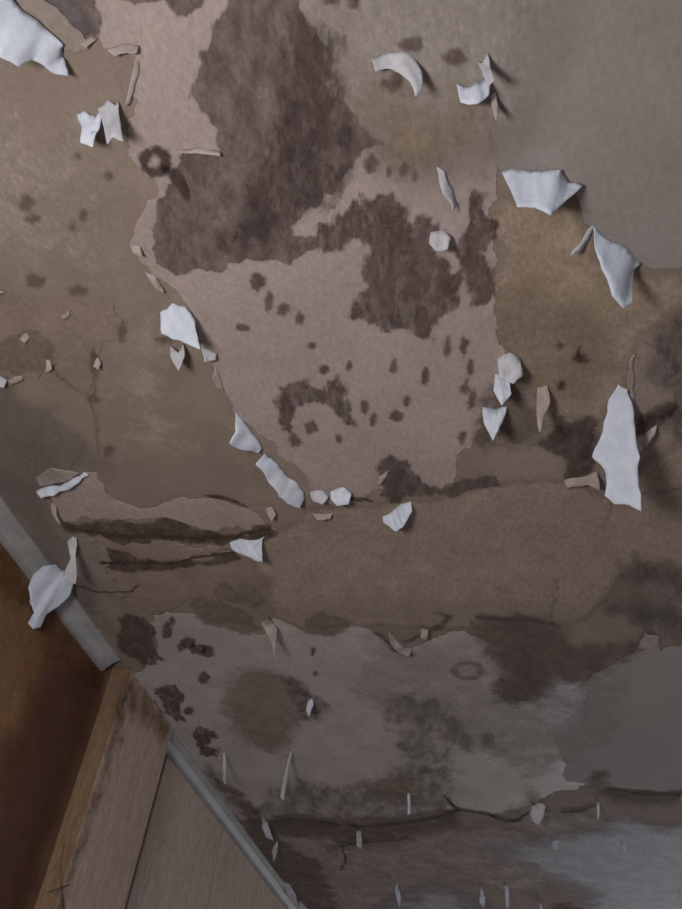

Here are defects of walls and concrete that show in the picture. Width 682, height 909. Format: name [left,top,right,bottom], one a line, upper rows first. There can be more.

water stain [45,0,102,36]
water stain [0,94,99,286]
peeling [79,0,682,521]
water stain [130,0,682,446]
water stain [0,331,51,374]
mould [118,614,174,668]
mould [177,637,214,657]
water stain [109,684,193,752]
mould [193,726,221,757]
water stain [227,672,326,751]
peeling [35,468,682,909]
crack [258,796,529,871]